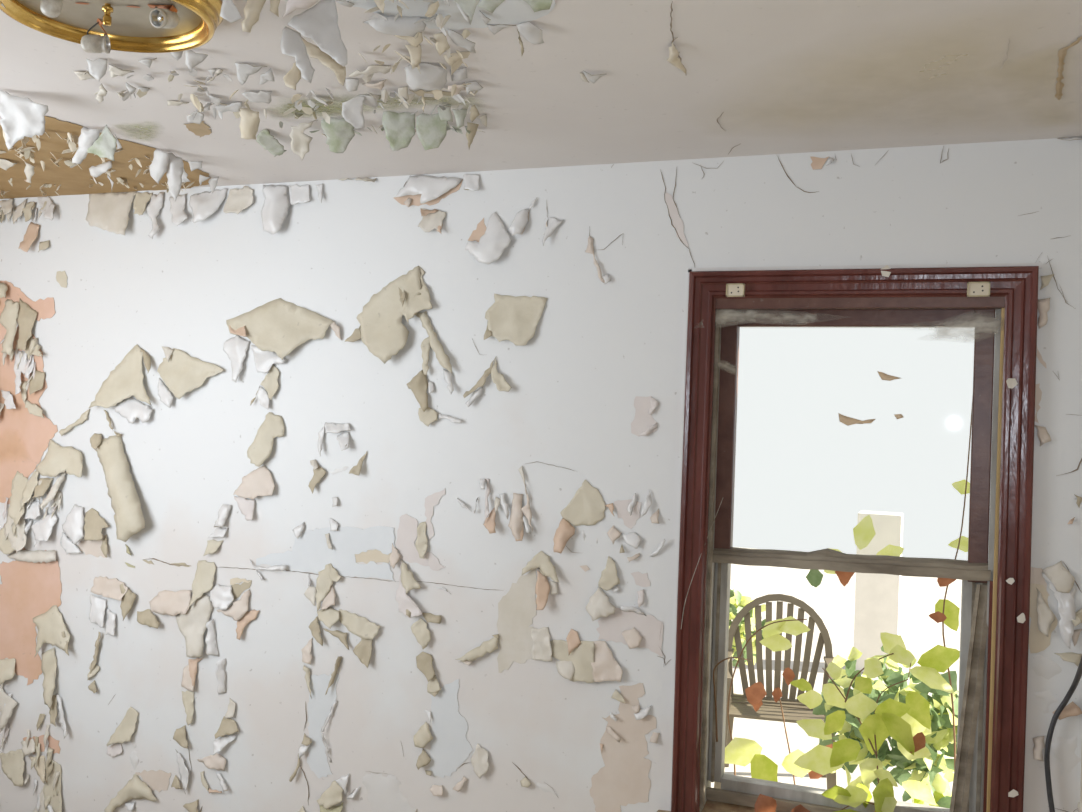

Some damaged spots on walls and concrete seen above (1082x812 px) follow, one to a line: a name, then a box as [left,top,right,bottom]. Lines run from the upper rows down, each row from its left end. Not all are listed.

peeling [167,0,556,120]
peeling [0,90,82,252]
peeling [85,147,323,239]
peeling [394,175,463,234]
crack [661,112,740,266]
peeling [472,294,548,353]
peeling [457,461,574,541]
crack [125,545,190,568]
crack [224,560,319,586]
crack [347,576,503,594]
peeling [455,480,665,720]
peeling [1017,561,1082,720]